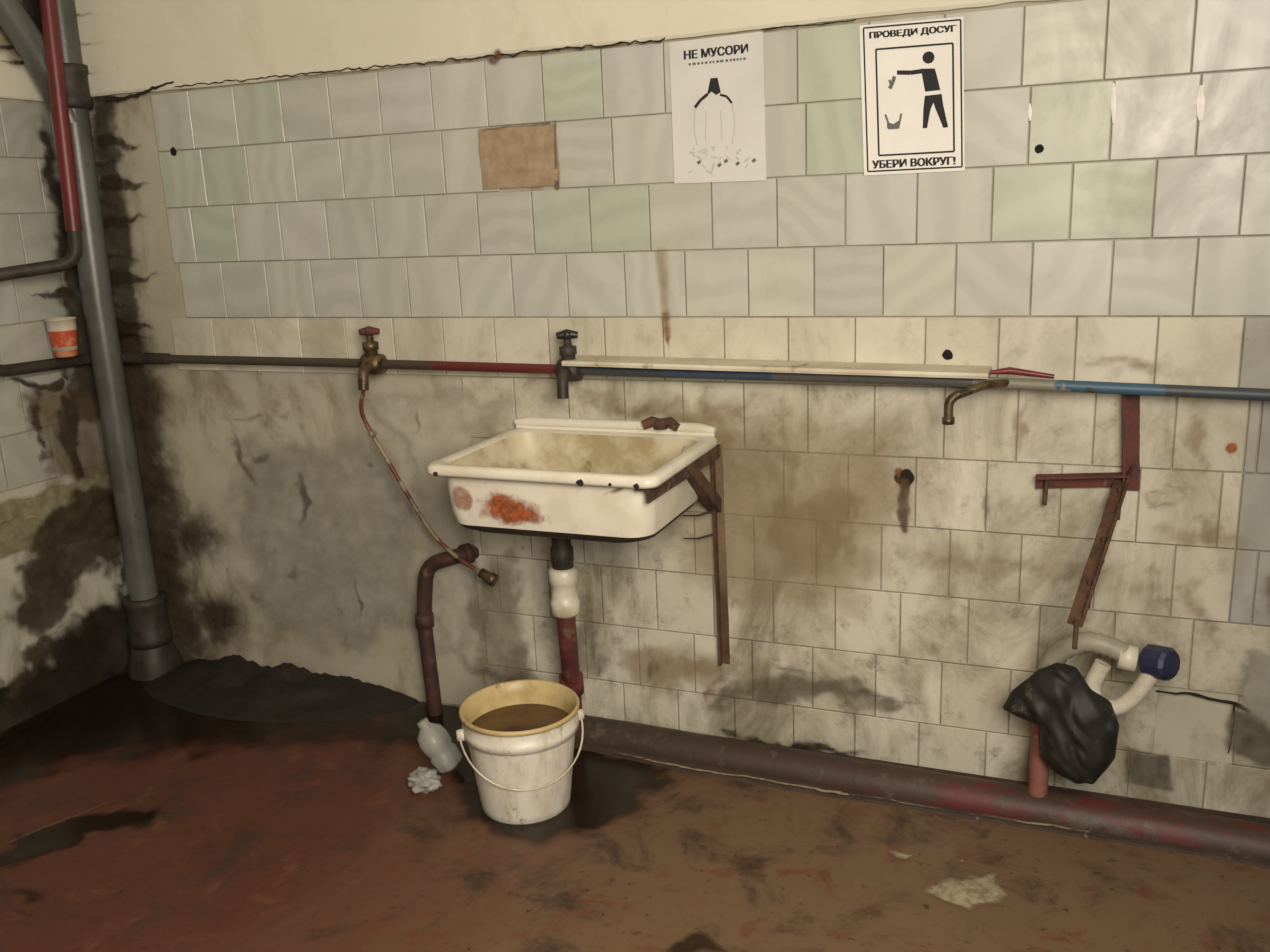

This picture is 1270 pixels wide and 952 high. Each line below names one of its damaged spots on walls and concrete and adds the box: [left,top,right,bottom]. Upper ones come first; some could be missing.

leakage [20,0,43,35]
leakage [0,27,24,65]
peeling [478,121,560,190]
leakage [0,95,674,840]
peeling [0,473,113,558]
peeling [366,390,505,651]
leakage [755,674,869,702]
crack [1156,690,1251,714]
leakage [723,730,856,756]